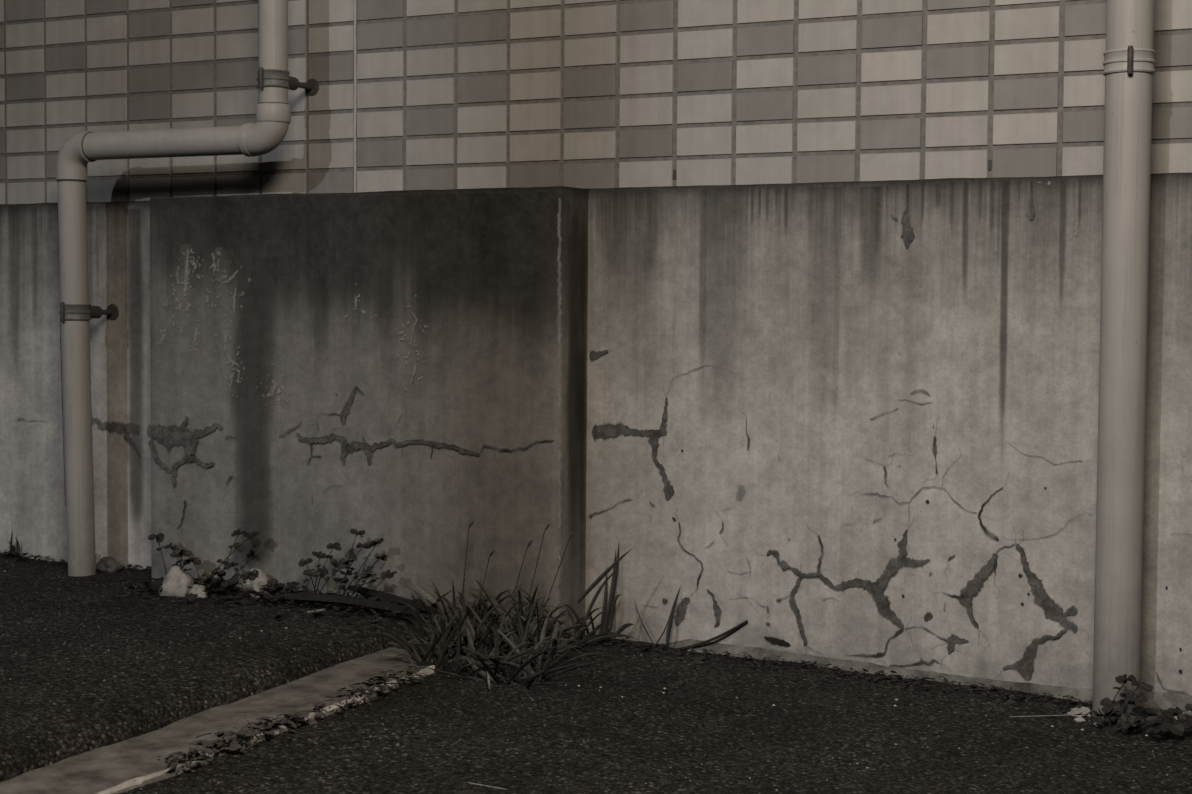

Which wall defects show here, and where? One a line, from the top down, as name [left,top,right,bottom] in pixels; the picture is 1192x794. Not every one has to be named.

leakage [239,299,266,561]
leakage [167,191,586,511]
crack [279,386,554,464]
crack [589,397,703,589]
crack [740,425,1077,680]